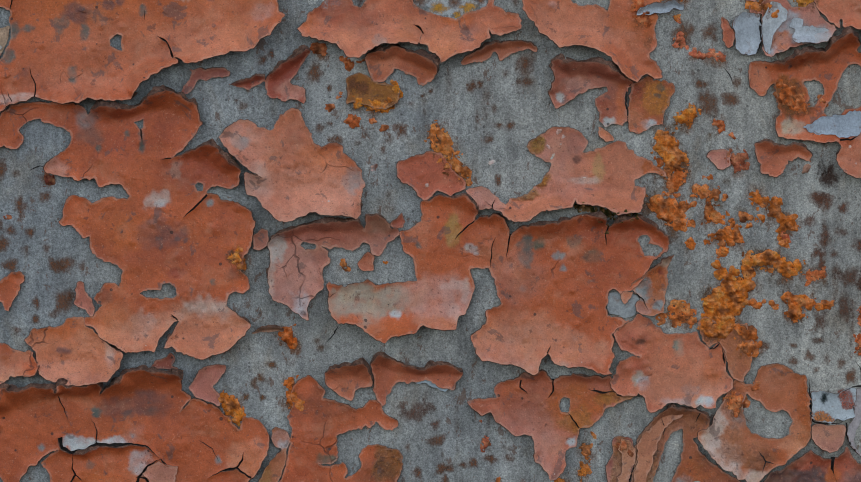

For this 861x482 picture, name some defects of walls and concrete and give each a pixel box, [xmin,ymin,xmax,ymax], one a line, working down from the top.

corrosion [308,42,411,151]
peeling [297,0,685,134]
corrosion [672,14,726,66]
corrosion [745,0,779,18]
peeling [721,0,861,179]
corrosion [424,120,473,186]
peeling [0,0,405,482]
corrosion [643,79,861,371]
peeling [326,126,861,482]
crack [58,423,167,482]
crack [200,441,251,479]
corrosion [577,431,597,482]